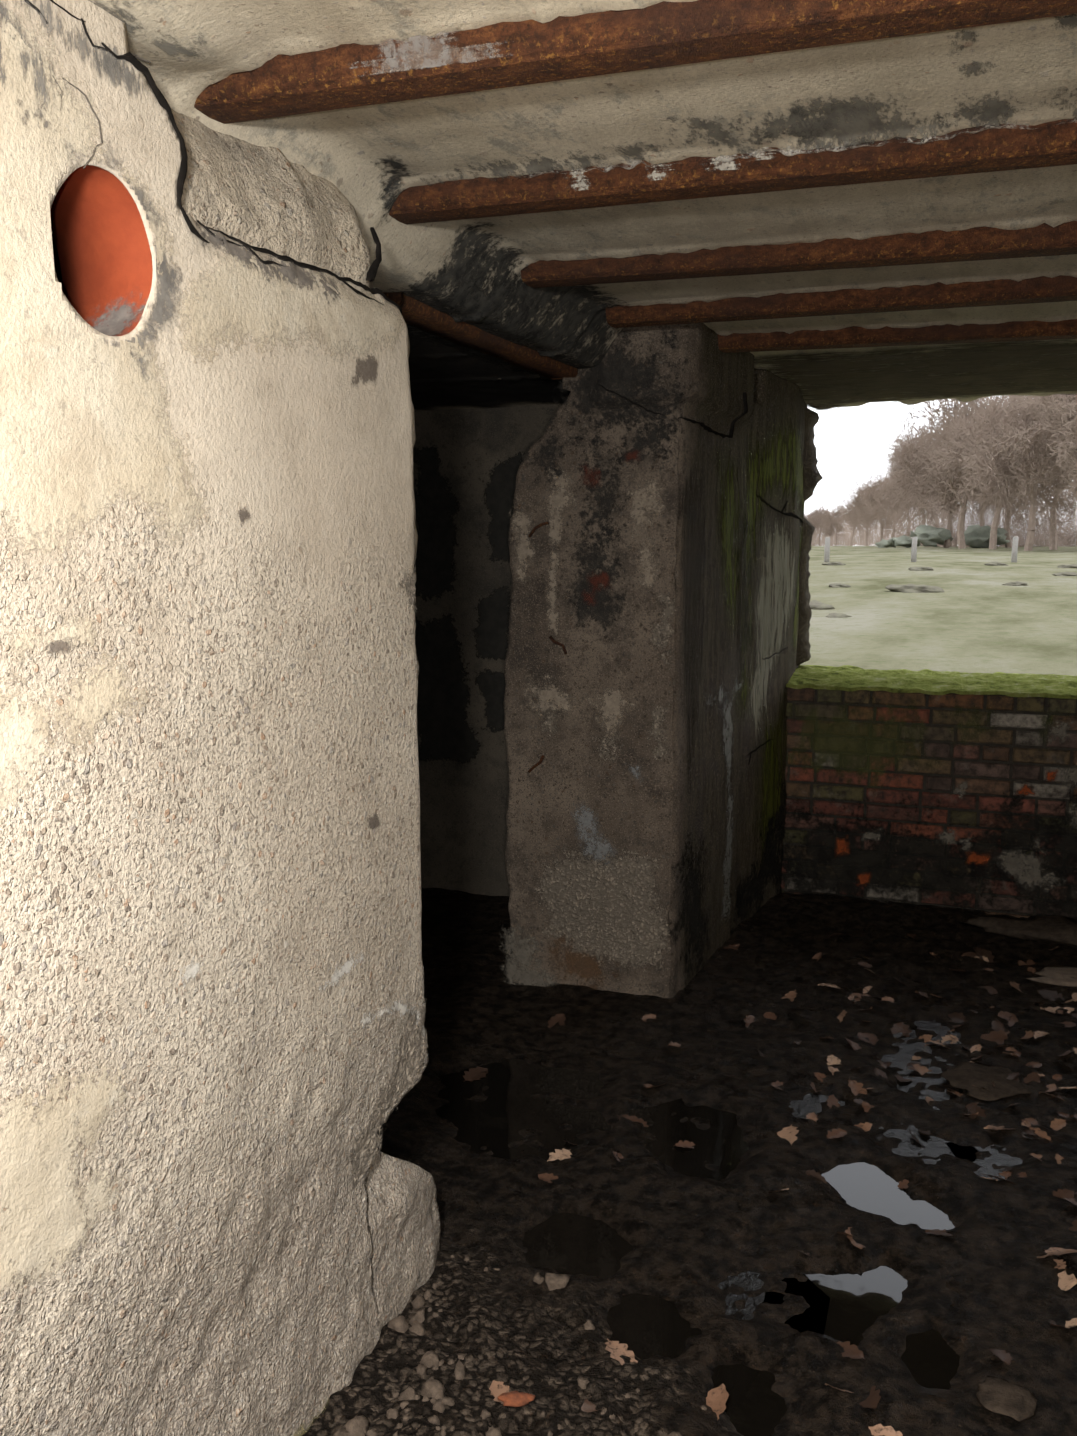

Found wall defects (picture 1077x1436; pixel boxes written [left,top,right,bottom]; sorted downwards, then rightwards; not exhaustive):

crack [24,0,408,328]
damp [391,223,630,381]
crack [756,494,803,523]
damp [670,448,1077,983]